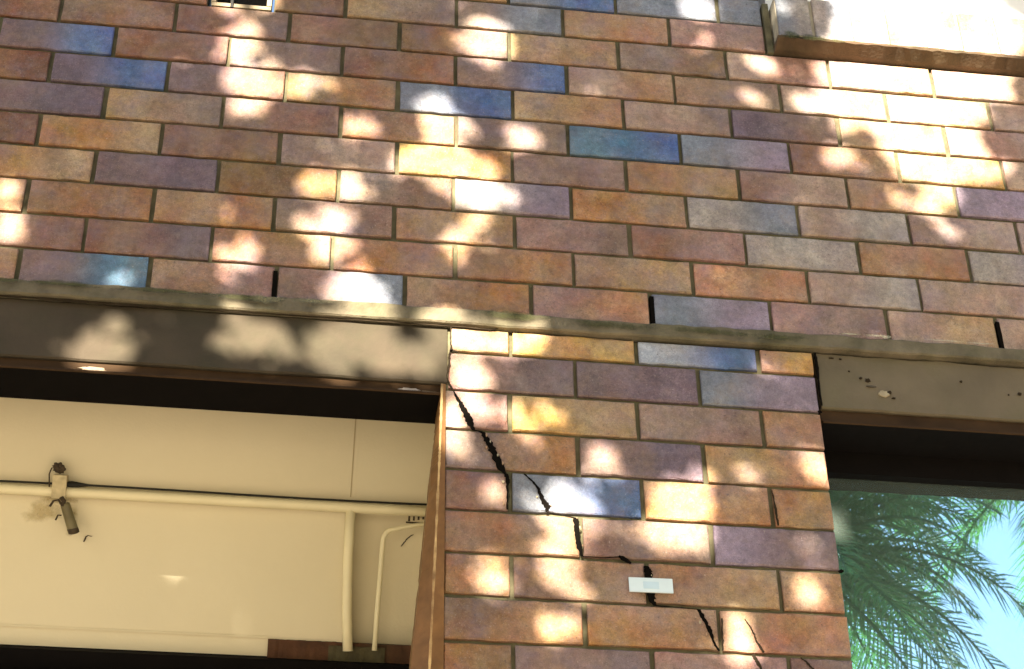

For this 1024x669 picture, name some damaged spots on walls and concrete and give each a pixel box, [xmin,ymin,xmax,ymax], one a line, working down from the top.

crack [0,295,765,669]